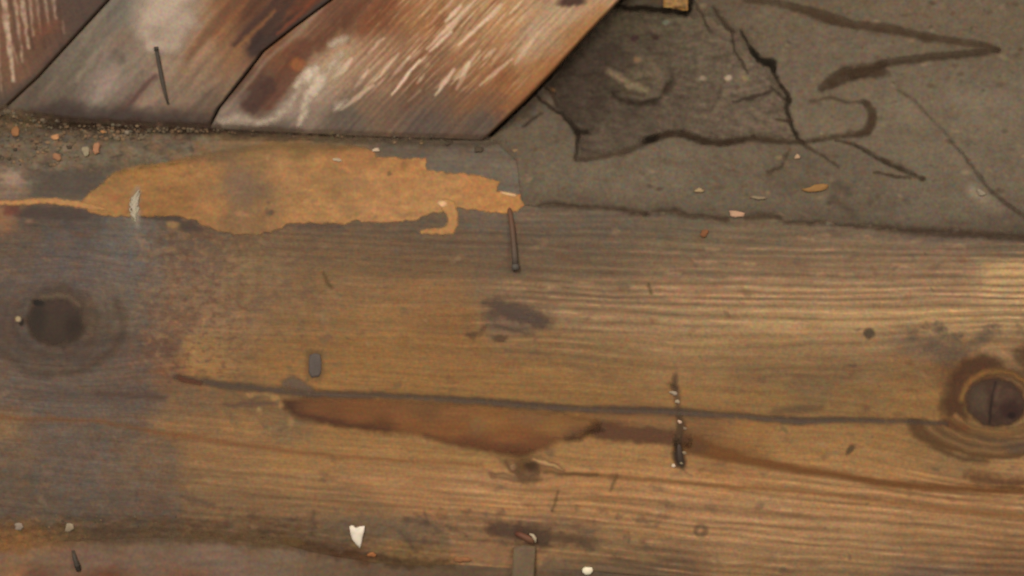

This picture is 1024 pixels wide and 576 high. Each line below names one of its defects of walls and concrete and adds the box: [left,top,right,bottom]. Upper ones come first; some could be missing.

crack [524,0,999,180]
peeling [0,144,524,235]
leakage [491,301,546,327]
crack [175,376,947,424]
leakage [284,398,1024,492]